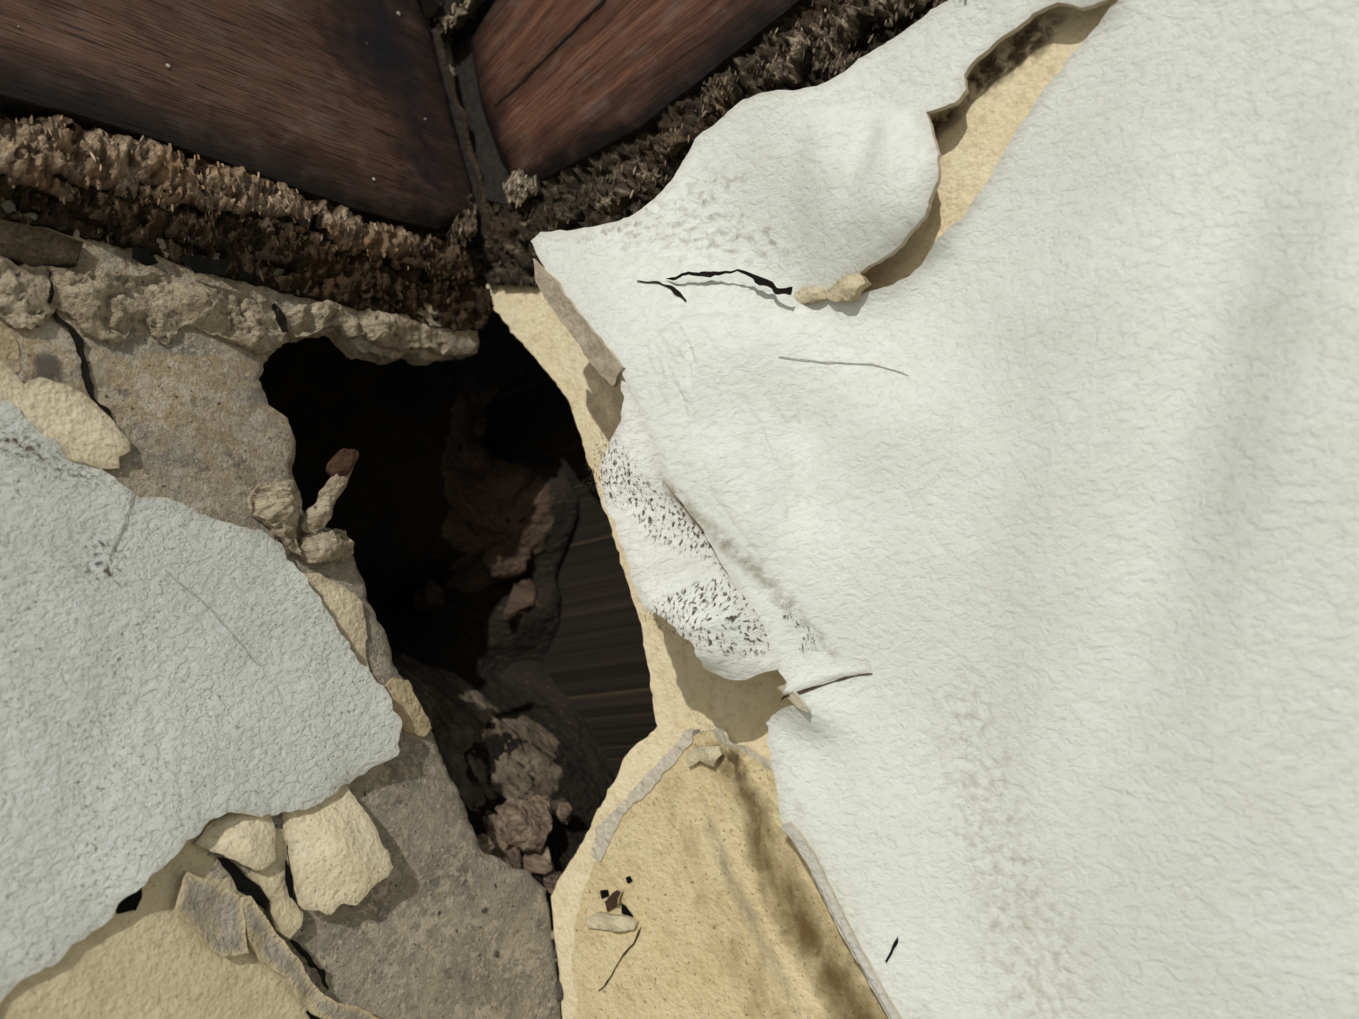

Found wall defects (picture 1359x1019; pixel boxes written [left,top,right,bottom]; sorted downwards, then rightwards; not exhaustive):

water stain [968,22,1055,98]
water stain [932,110,958,137]
crack [637,269,793,302]
mould [588,427,717,557]
peeling [259,0,1297,1019]
mould [644,574,769,654]
peeling [0,361,402,1019]